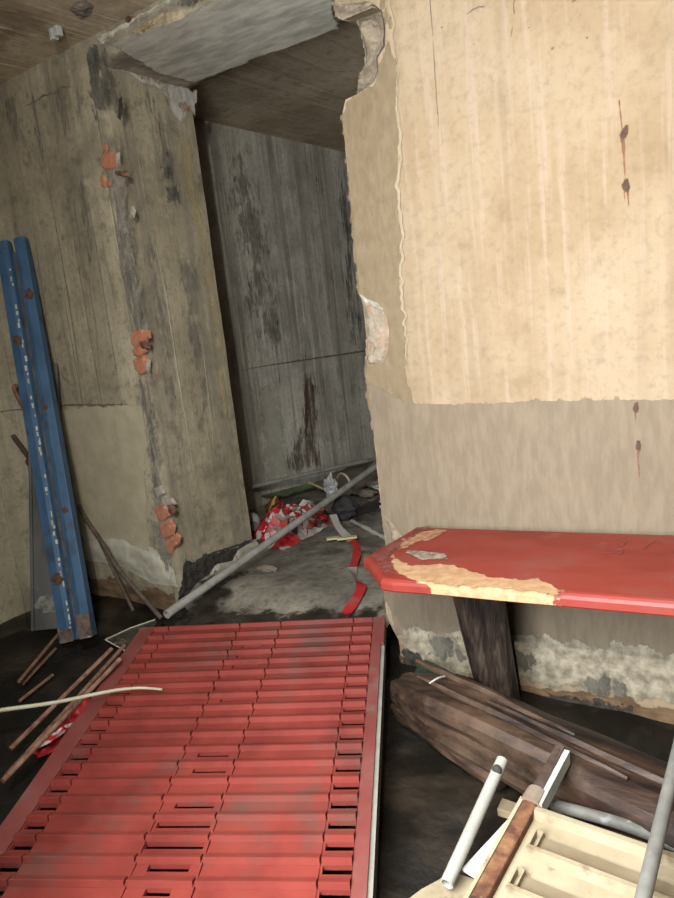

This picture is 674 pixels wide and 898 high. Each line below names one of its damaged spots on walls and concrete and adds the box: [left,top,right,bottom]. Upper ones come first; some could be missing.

water stain [87,0,338,120]
rust [619,100,630,204]
peeling [332,0,413,429]
water stain [353,382,674,545]
spalling [380,506,402,543]
water stain [88,539,461,636]
water stain [399,648,423,666]
water stain [506,602,674,656]
water stain [518,685,674,725]